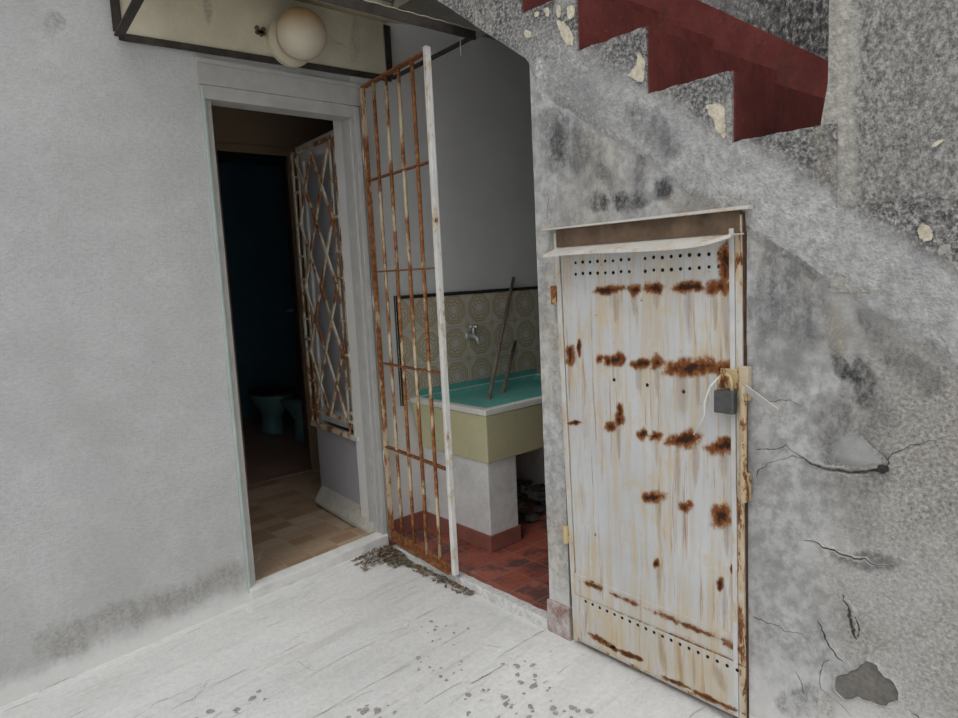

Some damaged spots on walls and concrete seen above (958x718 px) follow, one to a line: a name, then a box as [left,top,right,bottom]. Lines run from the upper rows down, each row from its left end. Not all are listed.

peeling [534,5,575,46]
peeling [627,53,645,82]
leakage [543,114,590,168]
leakage [593,192,644,211]
leakage [656,179,674,204]
rust [594,241,729,297]
rust [596,352,730,377]
crack [756,434,937,479]
crack [804,537,891,568]
rust [585,502,749,718]
crack [755,594,860,716]
spalling [831,656,905,709]